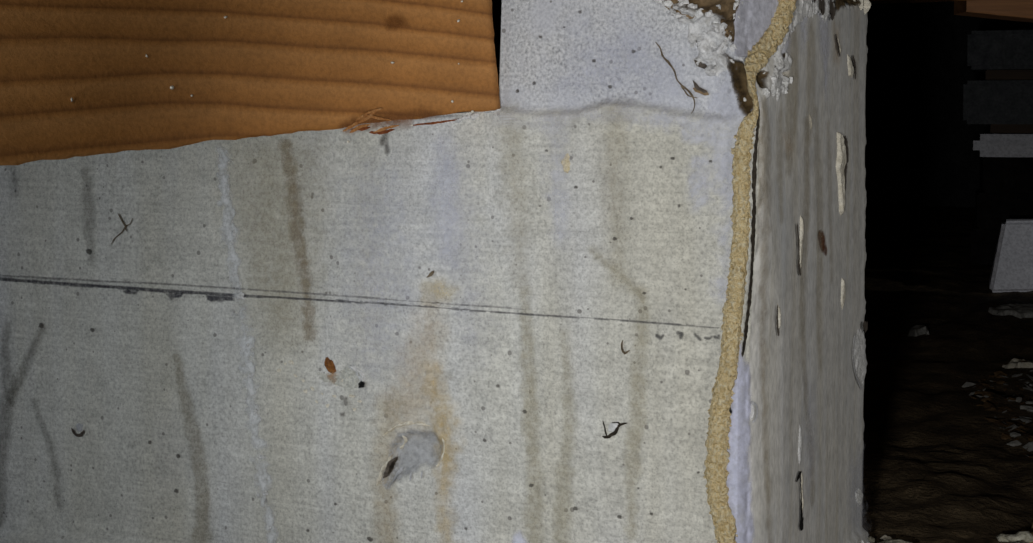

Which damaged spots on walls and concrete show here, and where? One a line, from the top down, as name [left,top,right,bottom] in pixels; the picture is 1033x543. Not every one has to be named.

spalling [835,0,871,14]
spalling [654,0,780,96]
peeling [835,34,856,79]
rust [324,357,336,380]
spalling [376,421,446,488]